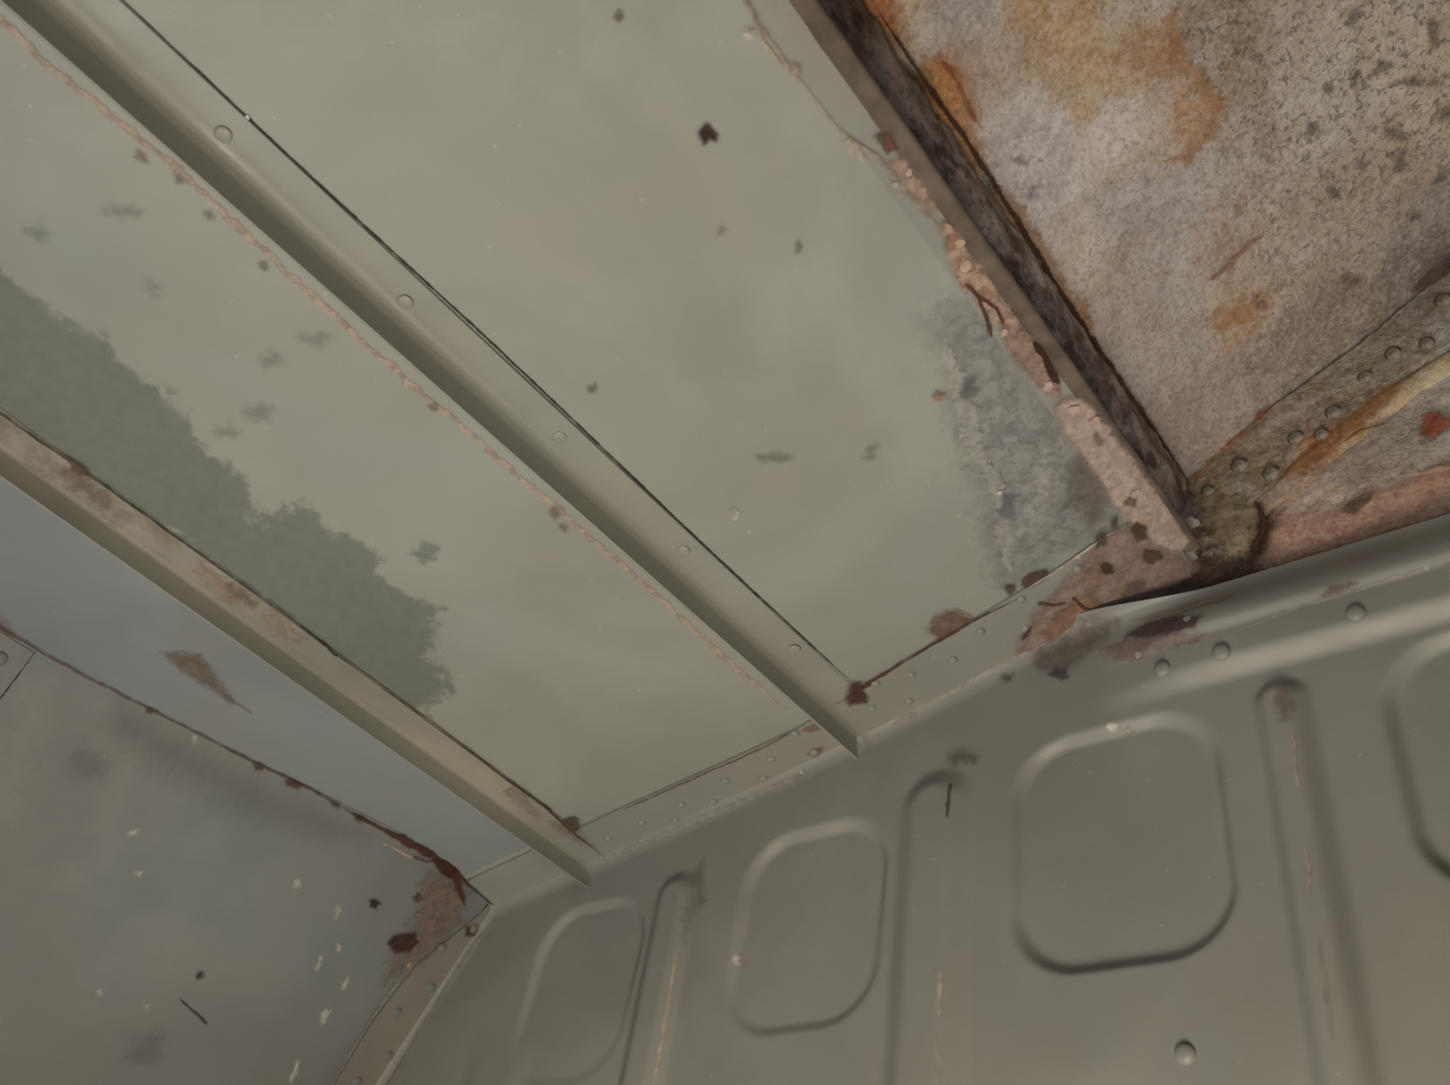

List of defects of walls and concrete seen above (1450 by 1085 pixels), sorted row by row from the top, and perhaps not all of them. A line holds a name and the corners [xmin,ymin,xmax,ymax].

corrosion [861,0,900,42]
corrosion [699,124,717,144]
peeling [1003,324,1200,565]
corrosion [1418,412,1450,438]
corrosion [846,513,1269,706]
corrosion [0,627,493,977]